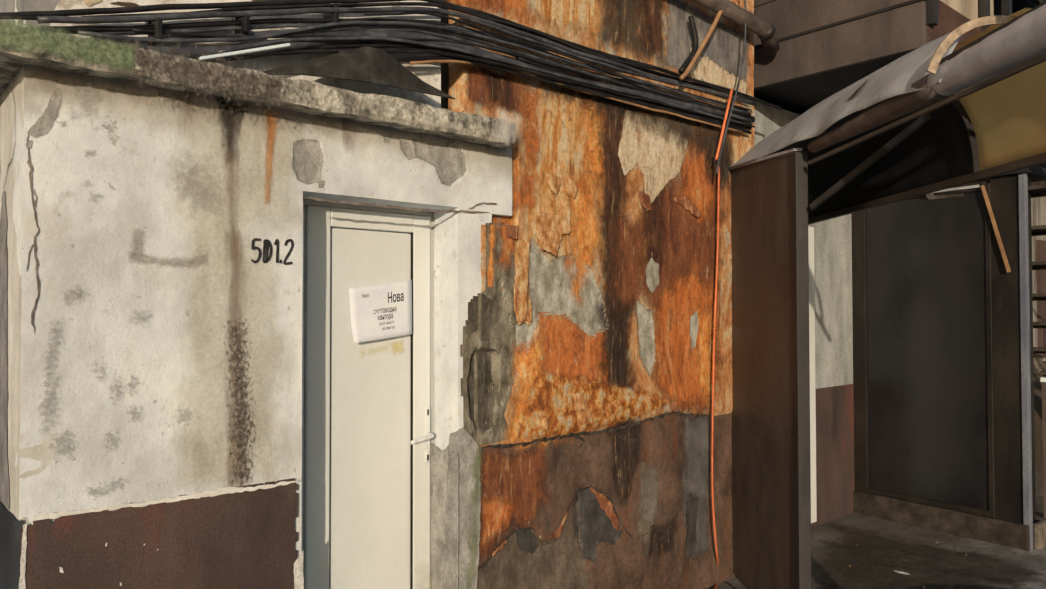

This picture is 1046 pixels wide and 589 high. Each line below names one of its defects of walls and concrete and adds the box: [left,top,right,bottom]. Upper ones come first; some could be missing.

corrosion [454,0,601,35]
peeling [26,88,61,148]
corrosion [266,112,279,202]
peeling [292,139,325,188]
peeling [384,135,466,186]
flaking render [618,111,688,210]
crack [3,131,40,334]
damp [34,37,380,484]
corrosion [468,66,722,560]
peeling [431,174,623,589]